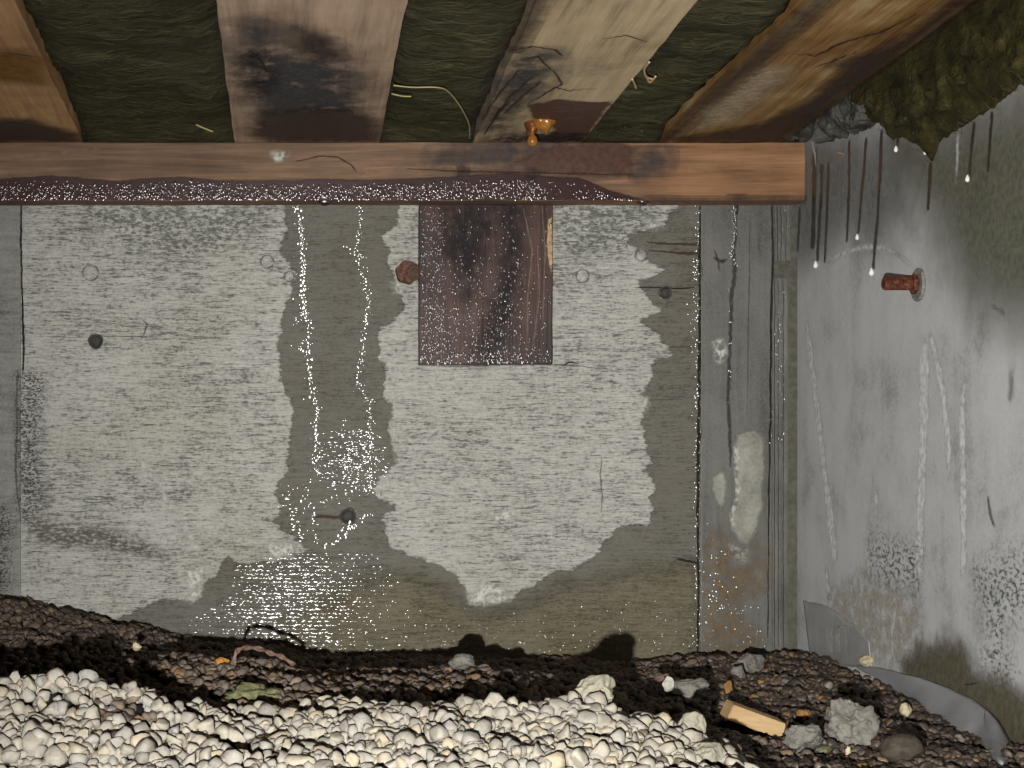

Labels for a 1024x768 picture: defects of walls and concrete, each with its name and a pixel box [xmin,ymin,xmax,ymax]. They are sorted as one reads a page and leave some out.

water stain [235,20,380,142]
water stain [0,52,701,663]
water stain [769,152,905,652]
water stain [872,335,967,582]
rust [702,548,766,654]
mould [981,562,1024,637]